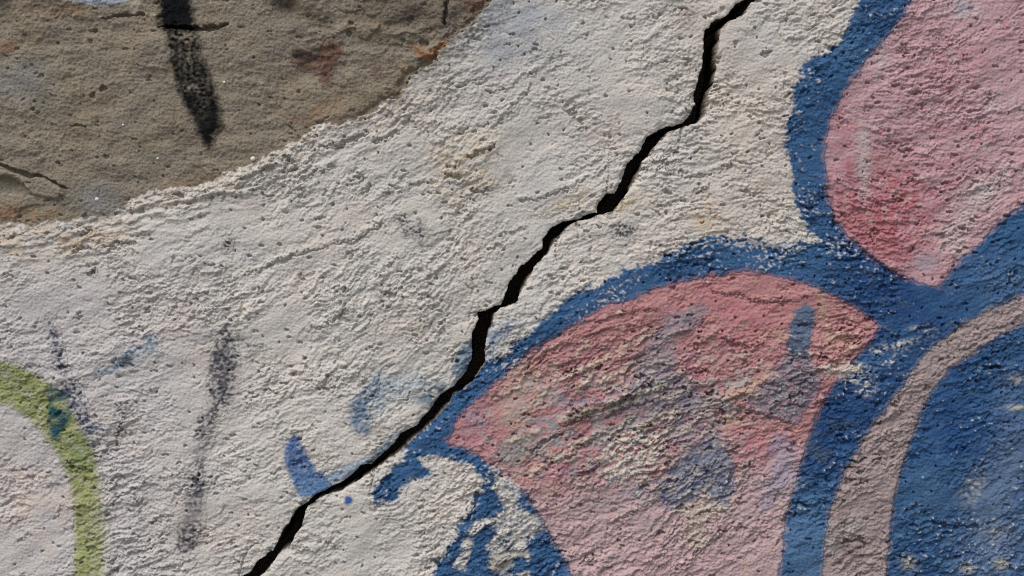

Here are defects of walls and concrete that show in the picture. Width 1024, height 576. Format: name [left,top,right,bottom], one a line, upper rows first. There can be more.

spalling [0,0,496,235]
crack [236,0,759,576]